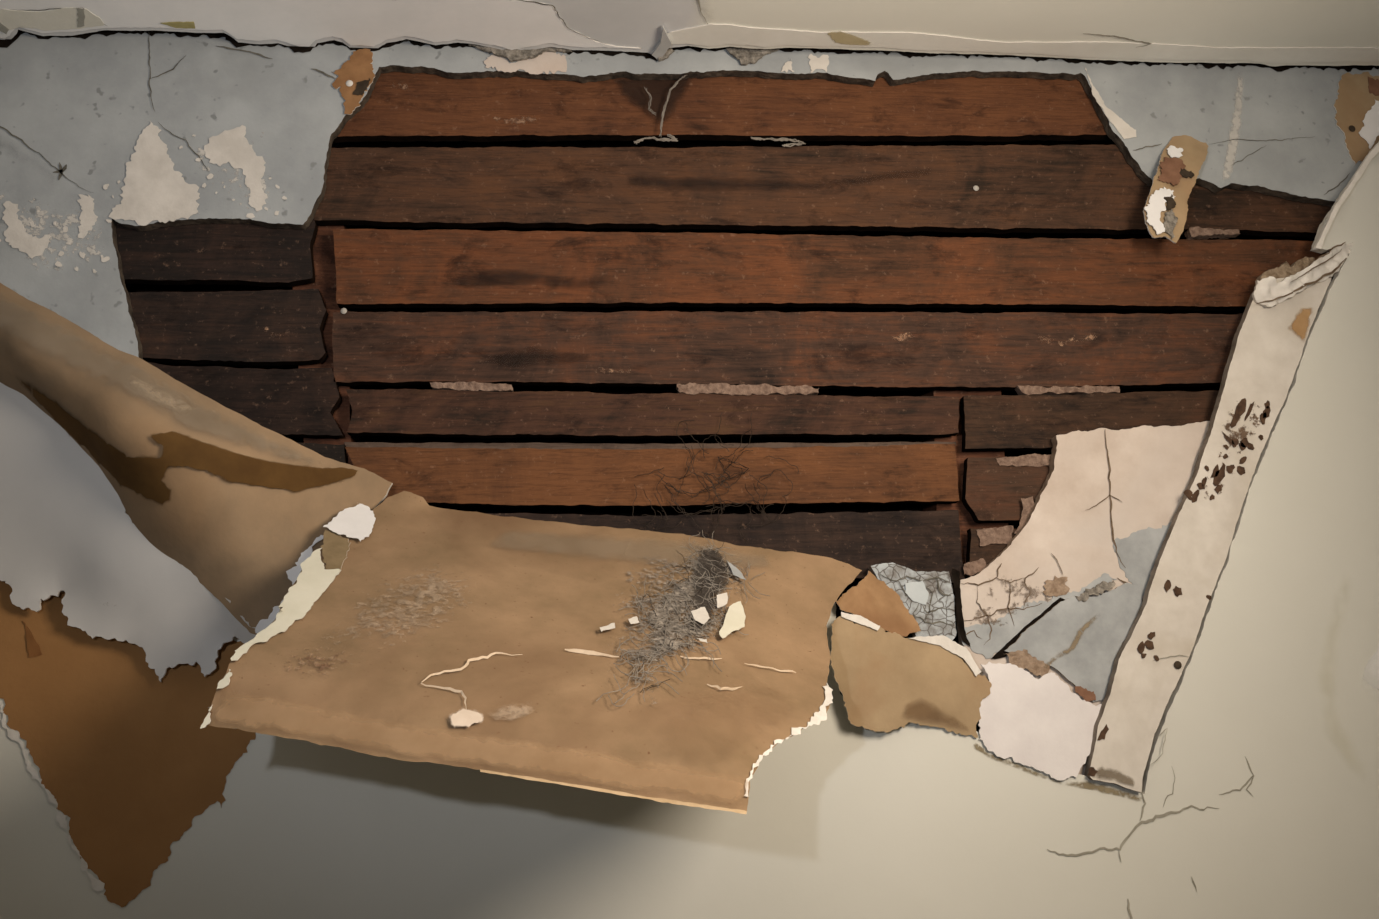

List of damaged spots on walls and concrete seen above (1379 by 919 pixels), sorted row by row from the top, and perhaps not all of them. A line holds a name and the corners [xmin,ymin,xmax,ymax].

crack [0,8,473,172]
peeling [468,44,572,75]
crack [520,0,740,61]
crack [780,33,1379,72]
crack [0,126,93,193]
peeling [0,121,287,273]
peeling [1183,398,1271,503]
spalling [429,503,923,516]
peeling [217,503,381,689]
peeling [691,593,746,643]
peeling [952,522,1182,677]
crack [1047,728,1254,861]